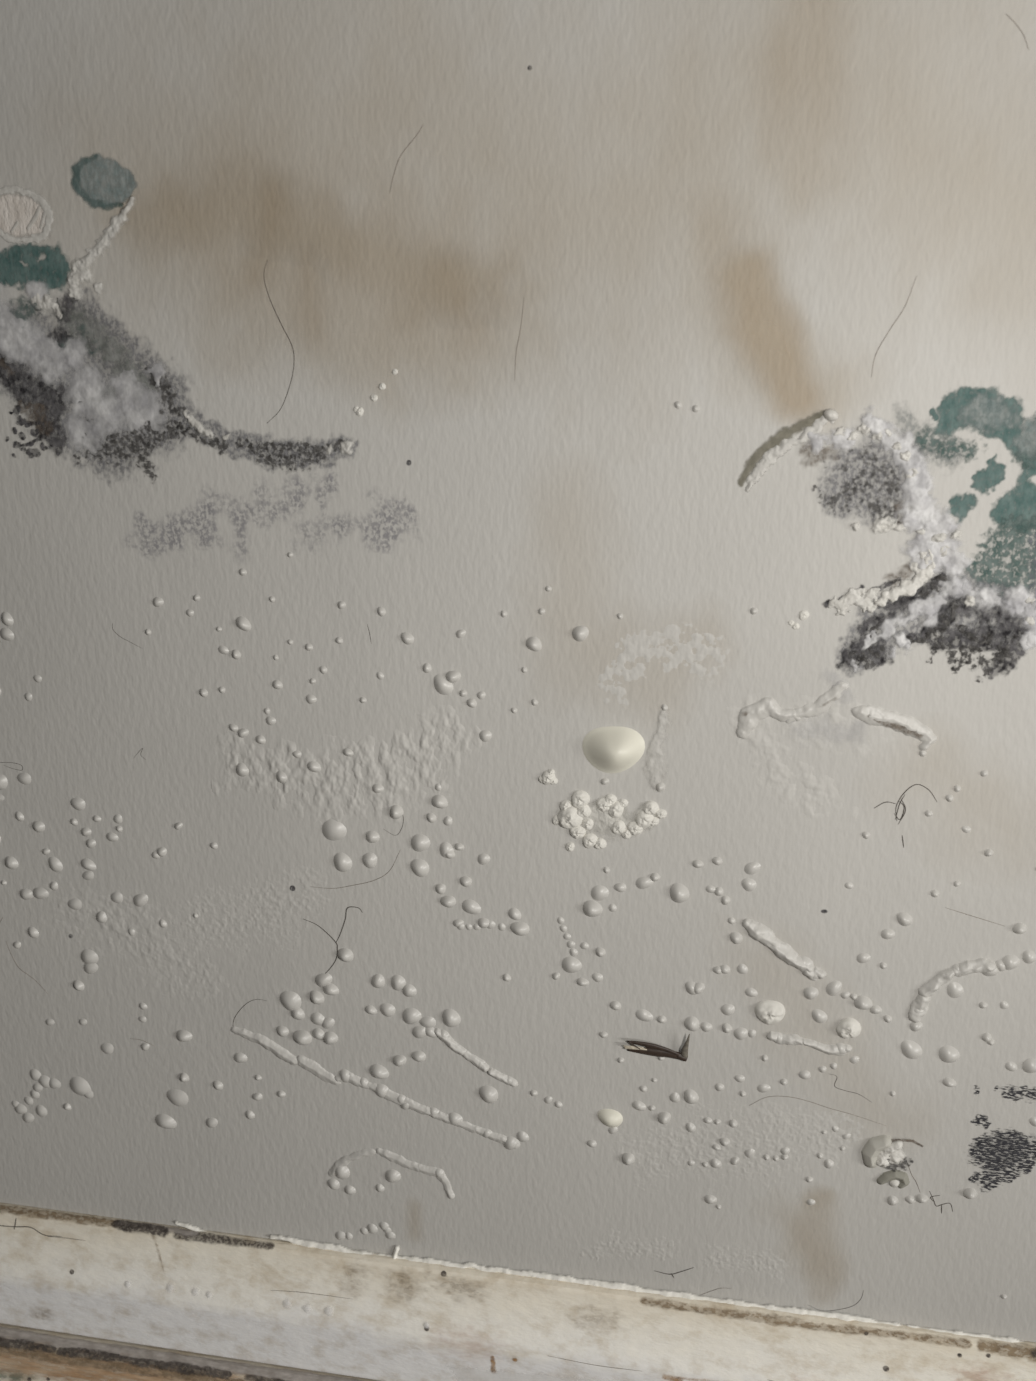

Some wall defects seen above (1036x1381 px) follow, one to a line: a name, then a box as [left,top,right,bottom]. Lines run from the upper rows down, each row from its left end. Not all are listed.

damp [738,387,1036,683]
damp [975,1085,1036,1101]
damp [968,1115,1036,1190]